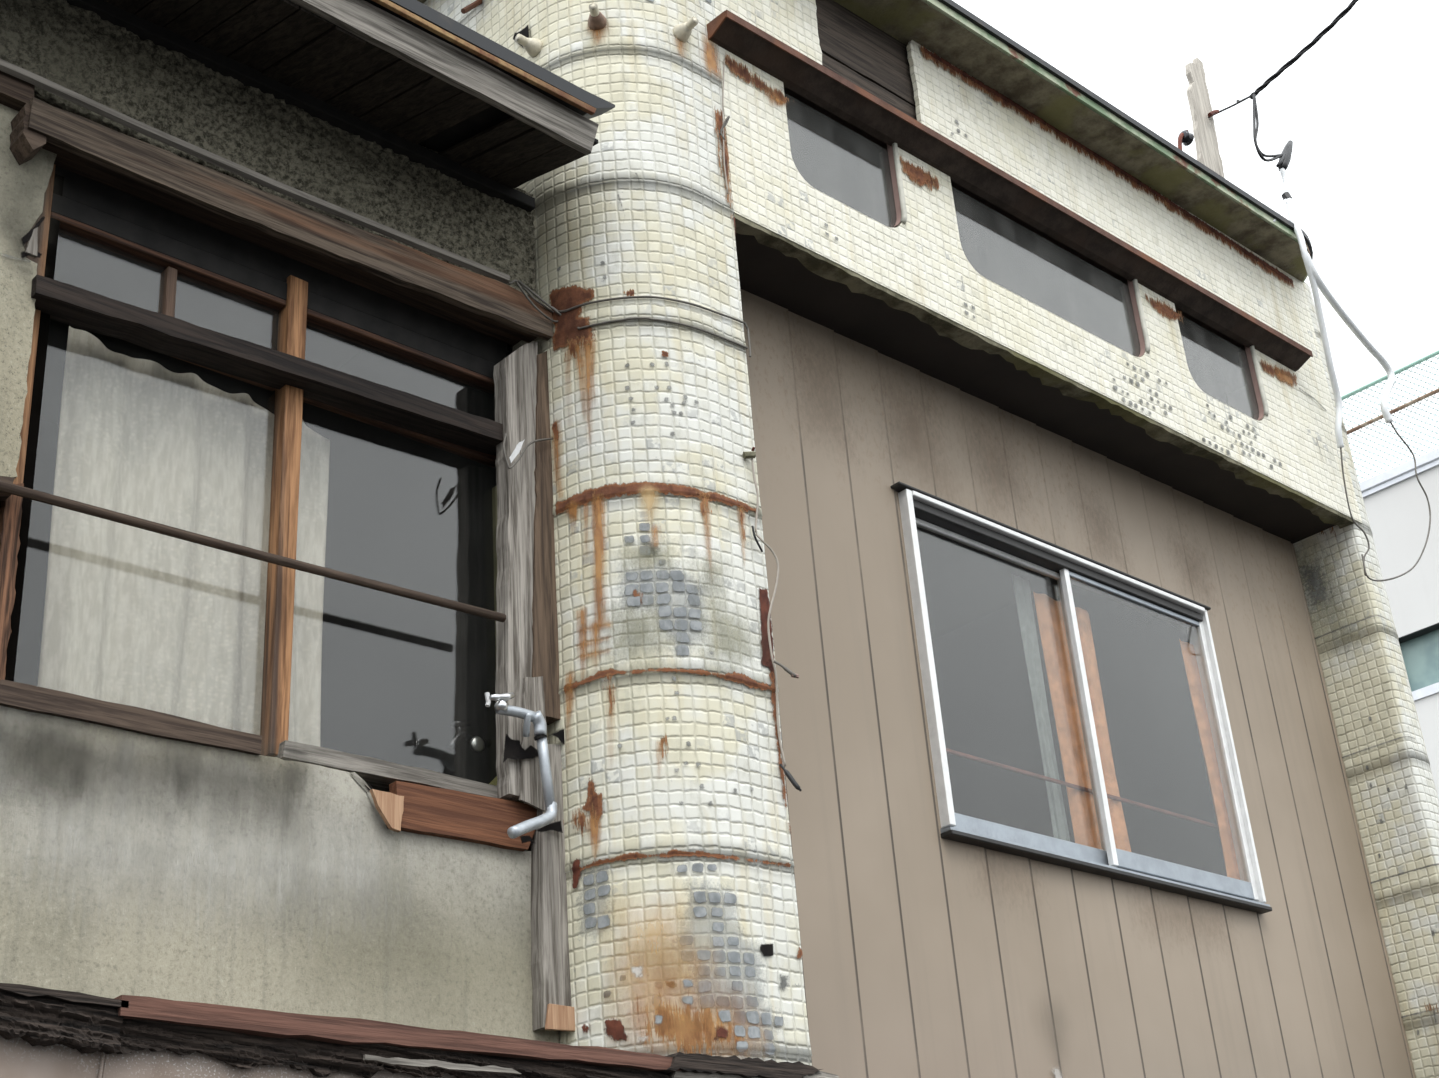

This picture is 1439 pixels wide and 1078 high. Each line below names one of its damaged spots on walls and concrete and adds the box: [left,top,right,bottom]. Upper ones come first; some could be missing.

rust [705,41,794,106]
rust [715,109,736,234]
rust [900,157,939,191]
rust [920,45,1294,287]
rust [549,284,595,402]
rust [555,481,790,830]
flaking render [350,772,395,834]
rust [563,778,791,889]
rust [582,966,744,1056]